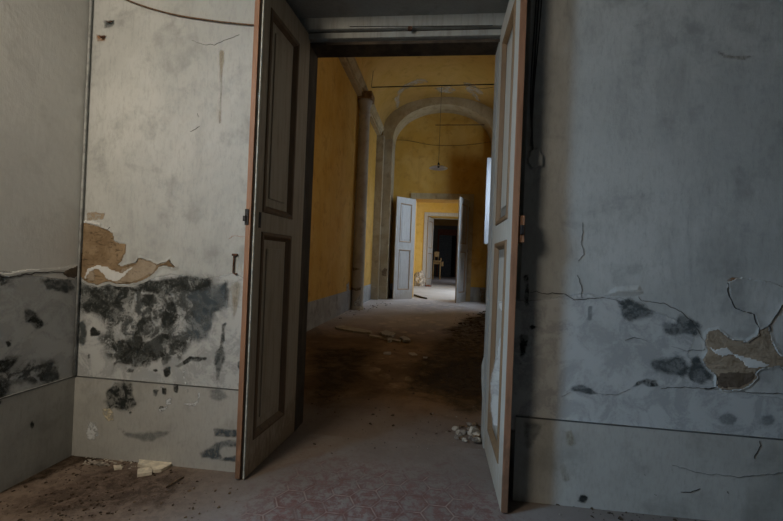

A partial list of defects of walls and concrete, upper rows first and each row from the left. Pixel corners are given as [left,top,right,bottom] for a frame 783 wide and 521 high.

flaking render [0,212,180,287]
crack [530,222,620,302]
damp [0,272,243,421]
damp [491,337,501,426]
damp [511,275,783,439]
crack [661,374,781,394]
flaking render [699,277,783,393]
damp [202,429,237,462]
crack [672,441,783,494]